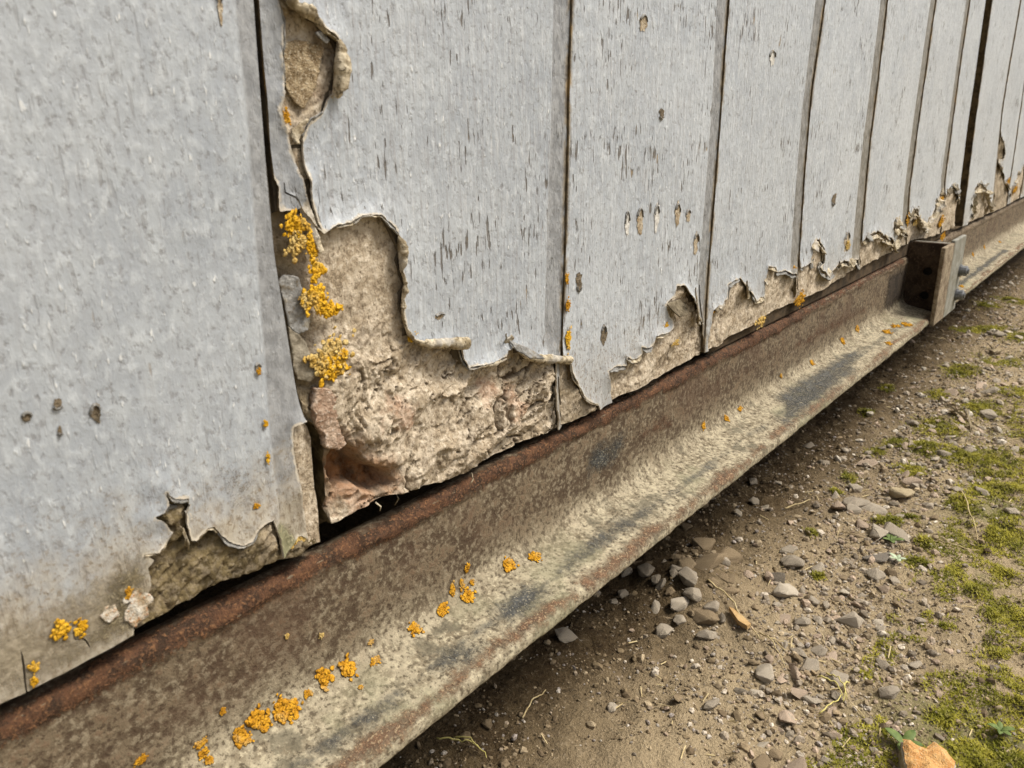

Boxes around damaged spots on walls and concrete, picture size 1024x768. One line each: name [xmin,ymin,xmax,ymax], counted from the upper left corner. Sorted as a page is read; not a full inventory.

peeling [278,0,352,187]
peeling [100,165,598,629]
rust [0,258,905,768]
peeling [609,135,1024,399]